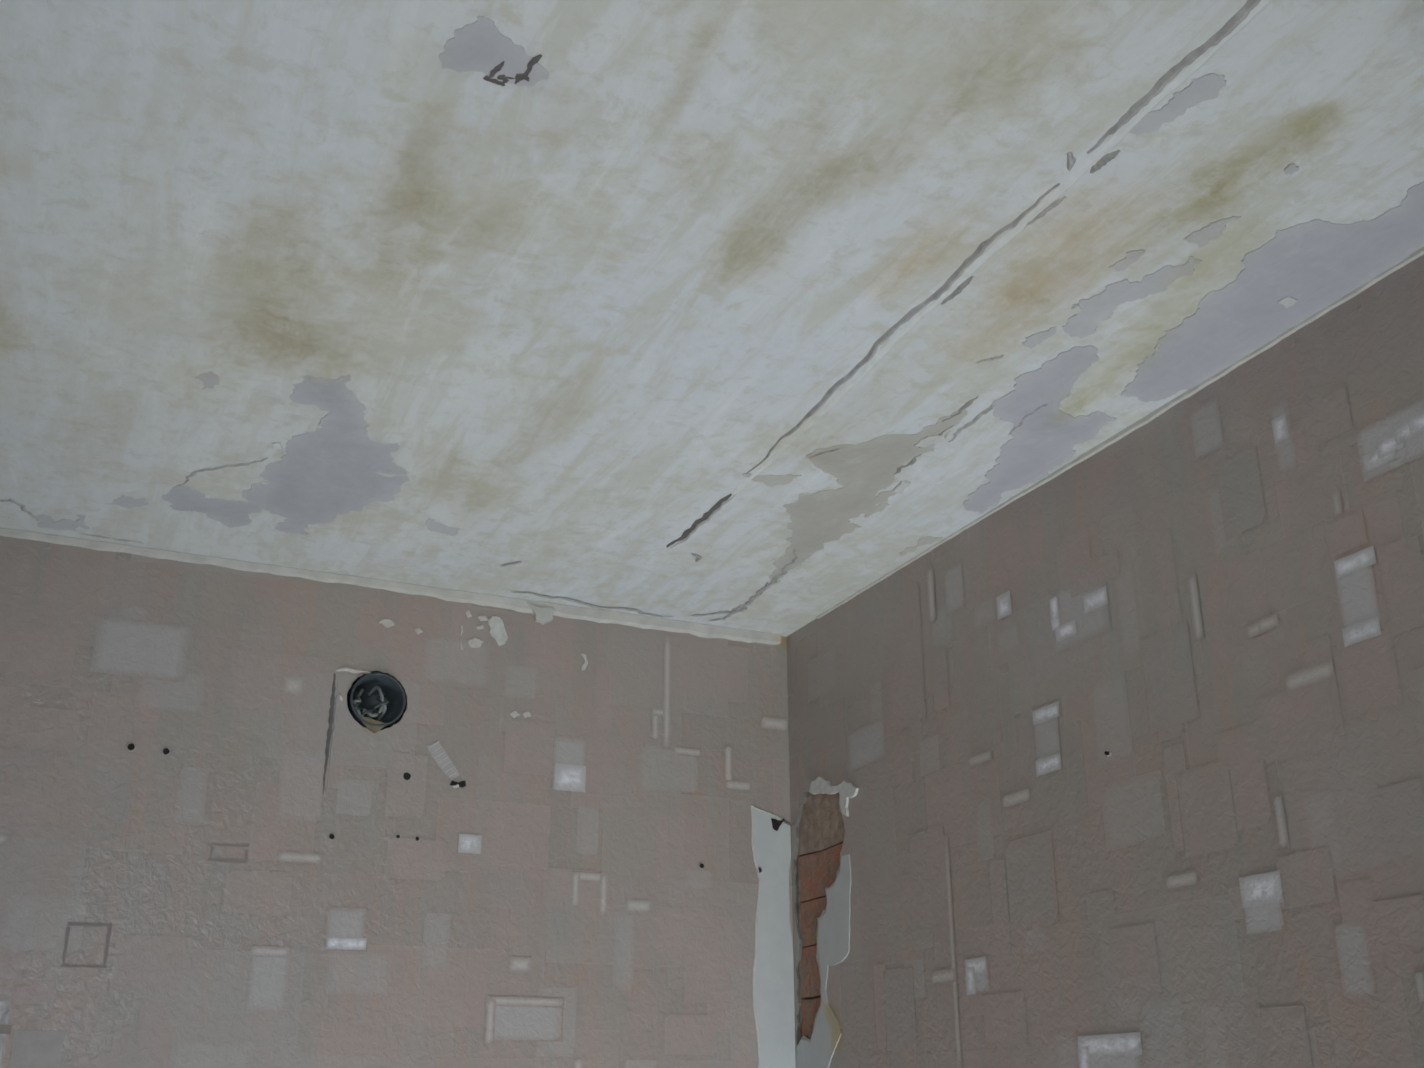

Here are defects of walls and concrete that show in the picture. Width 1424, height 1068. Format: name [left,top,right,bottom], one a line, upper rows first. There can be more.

peeling [439,16,549,87]
peeling [1128,73,1227,136]
crack [666,0,1261,562]
peeling [1121,182,1424,402]
peeling [105,374,411,536]
peeling [693,216,1241,615]
crack [502,549,798,621]
flaking render [752,777,859,1068]